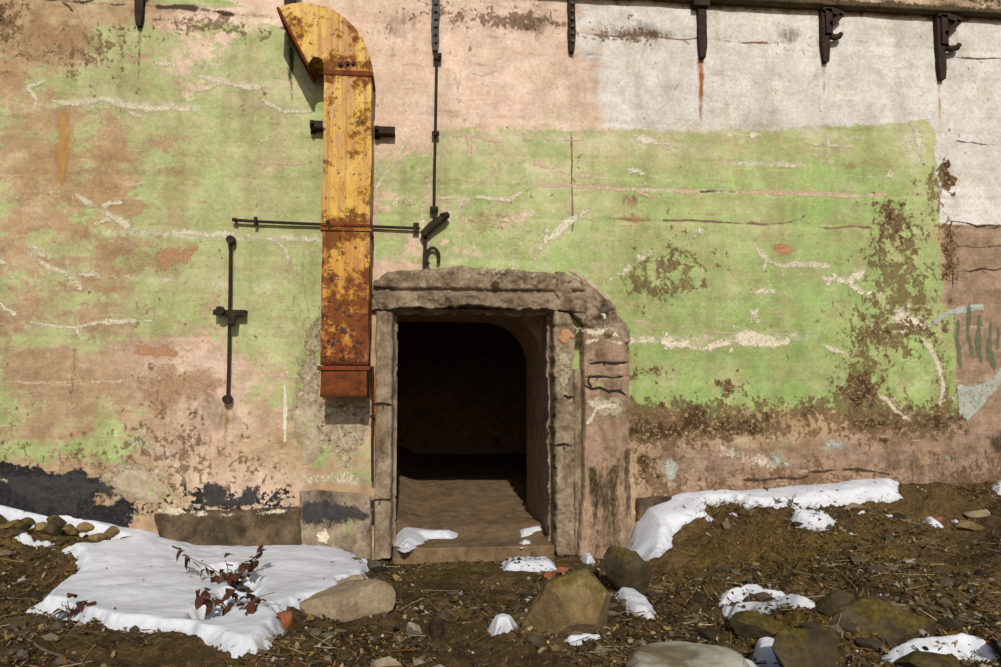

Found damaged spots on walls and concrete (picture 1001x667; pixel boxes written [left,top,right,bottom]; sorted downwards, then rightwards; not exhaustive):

spalling [938,158,961,196]
peeling [606,243,688,284]
spalling [866,199,918,265]
spalling [938,228,958,281]
crack [554,313,729,425]
spalling [819,269,970,450]